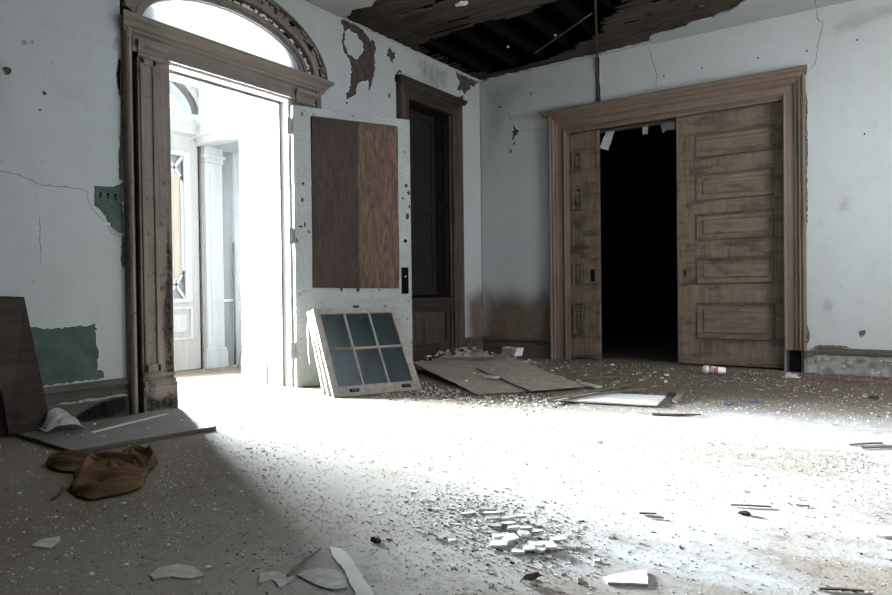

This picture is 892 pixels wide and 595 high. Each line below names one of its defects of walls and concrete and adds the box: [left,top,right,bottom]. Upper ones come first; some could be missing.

flaking render [339,0,742,106]
crack [2,171,102,219]
peeling [93,58,125,269]
peeling [30,322,105,387]